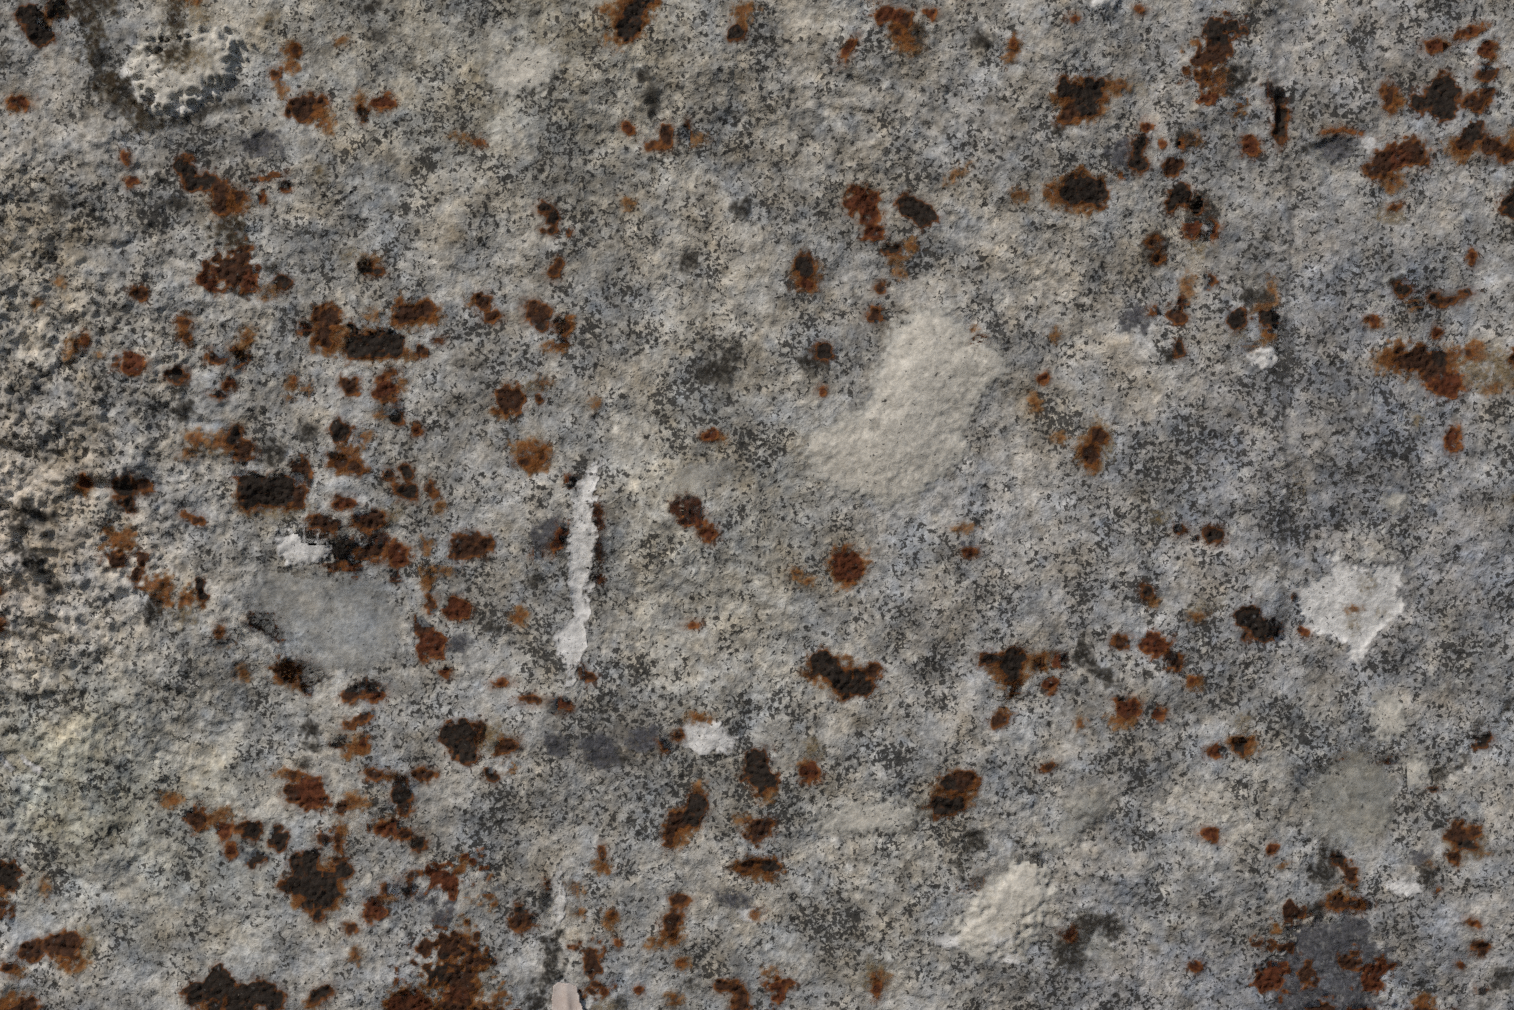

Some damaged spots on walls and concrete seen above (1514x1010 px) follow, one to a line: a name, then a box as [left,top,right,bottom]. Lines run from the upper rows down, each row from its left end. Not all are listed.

corrosion [1049,74,1140,137]
corrosion [1177,11,1265,117]
corrosion [1361,23,1514,223]
corrosion [842,184,939,322]
corrosion [1011,122,1220,365]
corrosion [1364,314,1514,399]
corrosion [179,296,495,679]
corrosion [803,649,883,701]
corrosion [978,646,1069,730]
corrosion [160,677,644,1010]
corrosion [0,925,95,1010]
corrosion [1249,884,1437,1010]